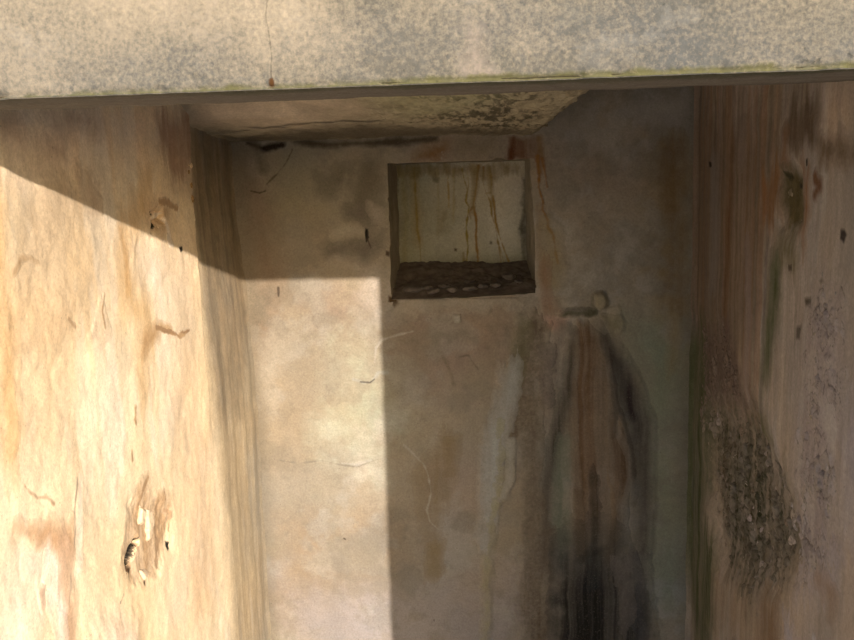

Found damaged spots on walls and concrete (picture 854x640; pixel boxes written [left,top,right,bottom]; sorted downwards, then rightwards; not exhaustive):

crack [265,0,275,86]
corrosion [504,134,572,332]
spalling [775,157,836,302]
spalling [120,470,174,591]
leakage [380,297,663,640]
spalling [699,306,803,628]